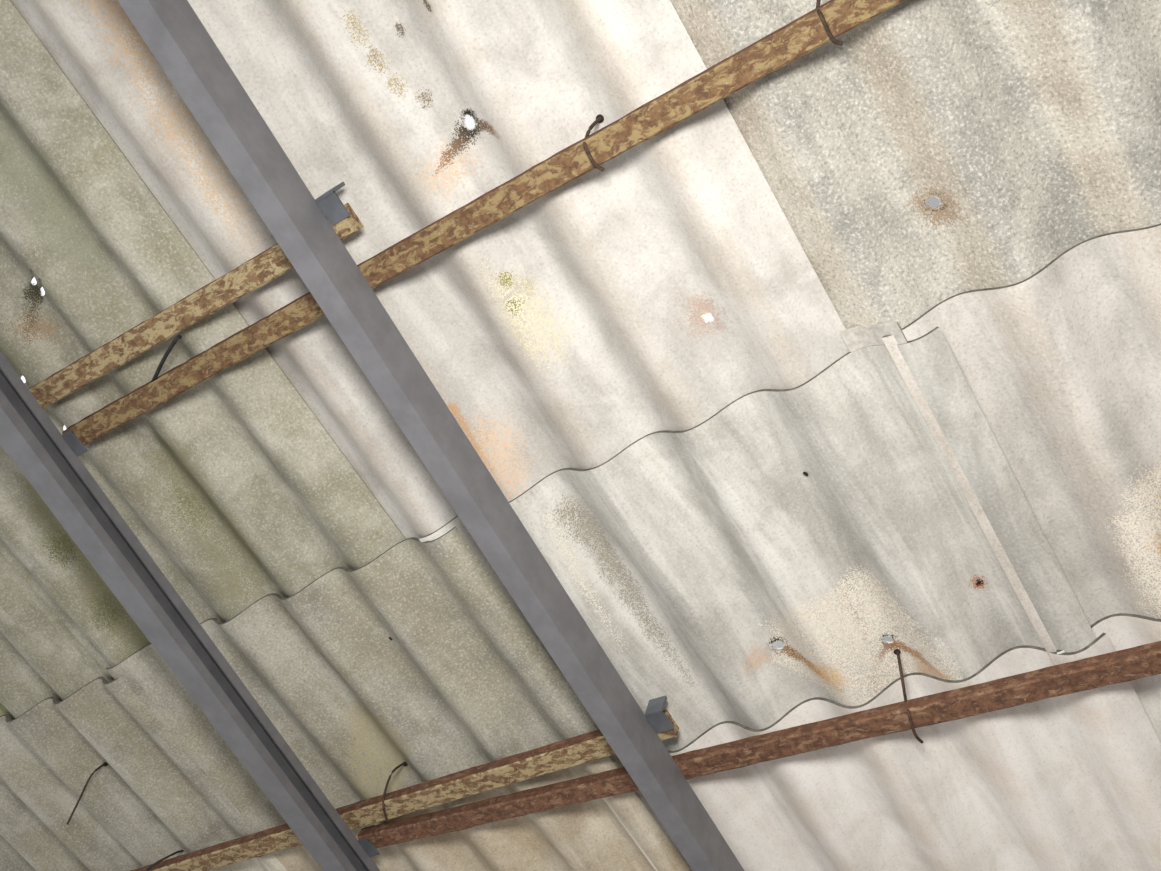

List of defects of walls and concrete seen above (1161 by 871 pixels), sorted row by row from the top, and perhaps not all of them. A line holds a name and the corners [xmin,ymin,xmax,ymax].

rust [410,109,499,207]
rust [1100,455,1161,619]
rust [738,565,964,706]